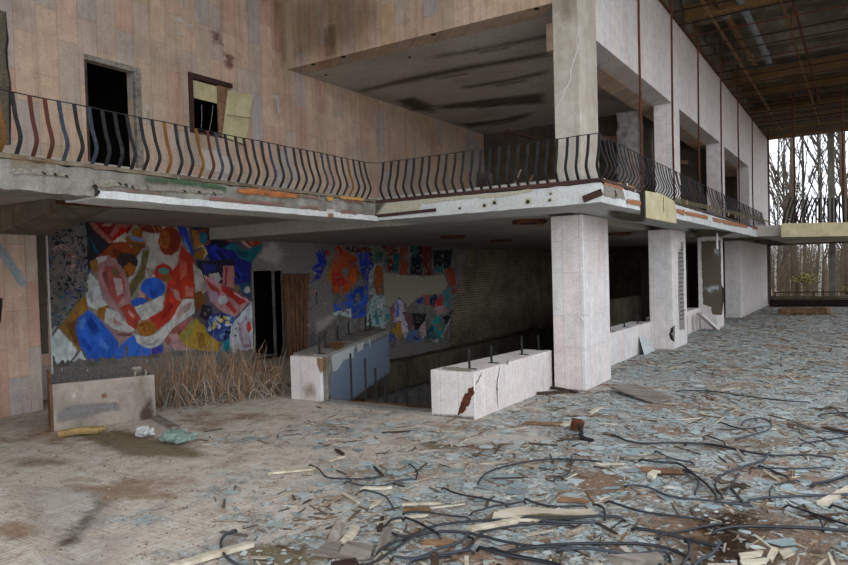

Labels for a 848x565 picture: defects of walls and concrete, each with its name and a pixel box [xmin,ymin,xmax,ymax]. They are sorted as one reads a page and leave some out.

damp [363,54,545,91]
crack [557,25,580,107]
damp [400,94,543,112]
spalling [93,177,366,215]
peeling [376,189,533,215]
spalling [604,178,641,206]
flaking render [330,248,553,401]
crack [458,366,500,415]